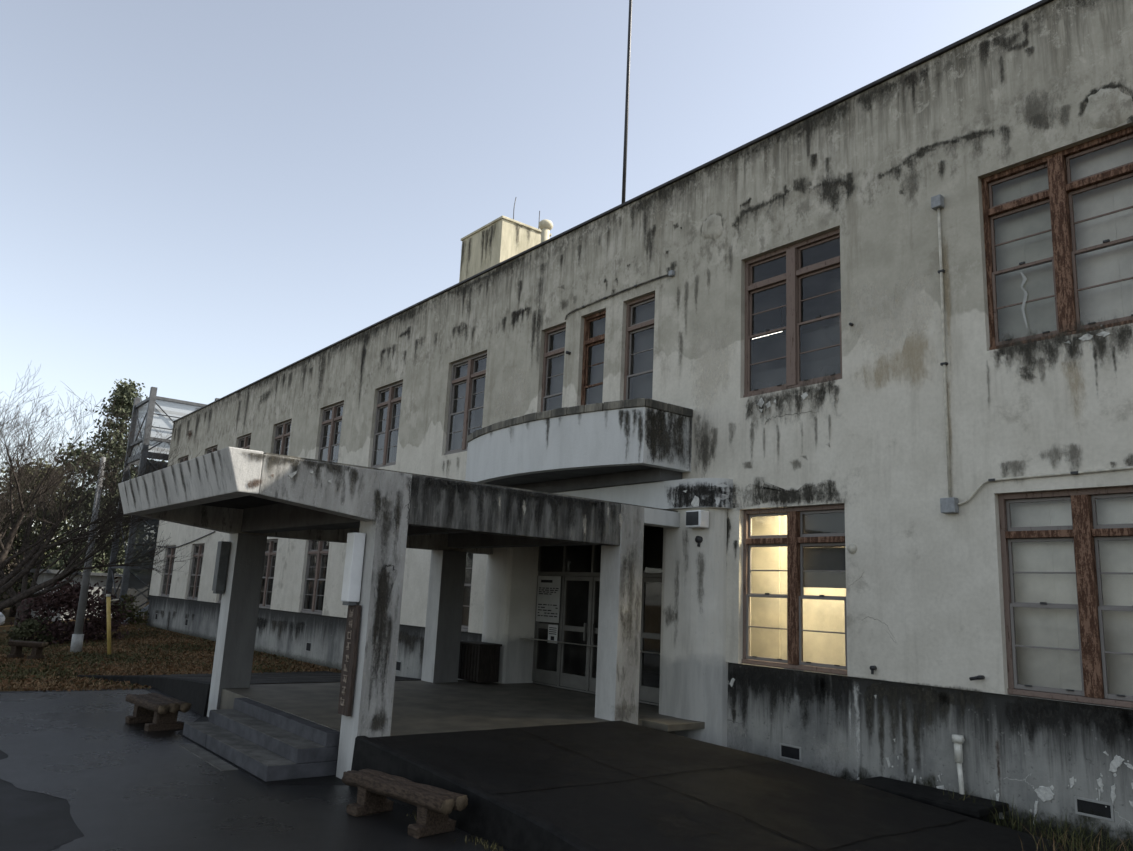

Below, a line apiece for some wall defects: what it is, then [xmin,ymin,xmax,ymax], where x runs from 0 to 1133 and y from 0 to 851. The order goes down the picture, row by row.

water stain [979,23,1033,81]
water stain [1026,96,1069,127]
water stain [995,320,1131,379]
water stain [619,410,717,465]
water stain [375,461,621,545]
water stain [667,462,842,556]
water stain [373,569,425,692]
water stain [372,712,386,730]
water stain [728,668,984,775]
water stain [1005,700,1133,743]
peeling [1029,785,1055,820]